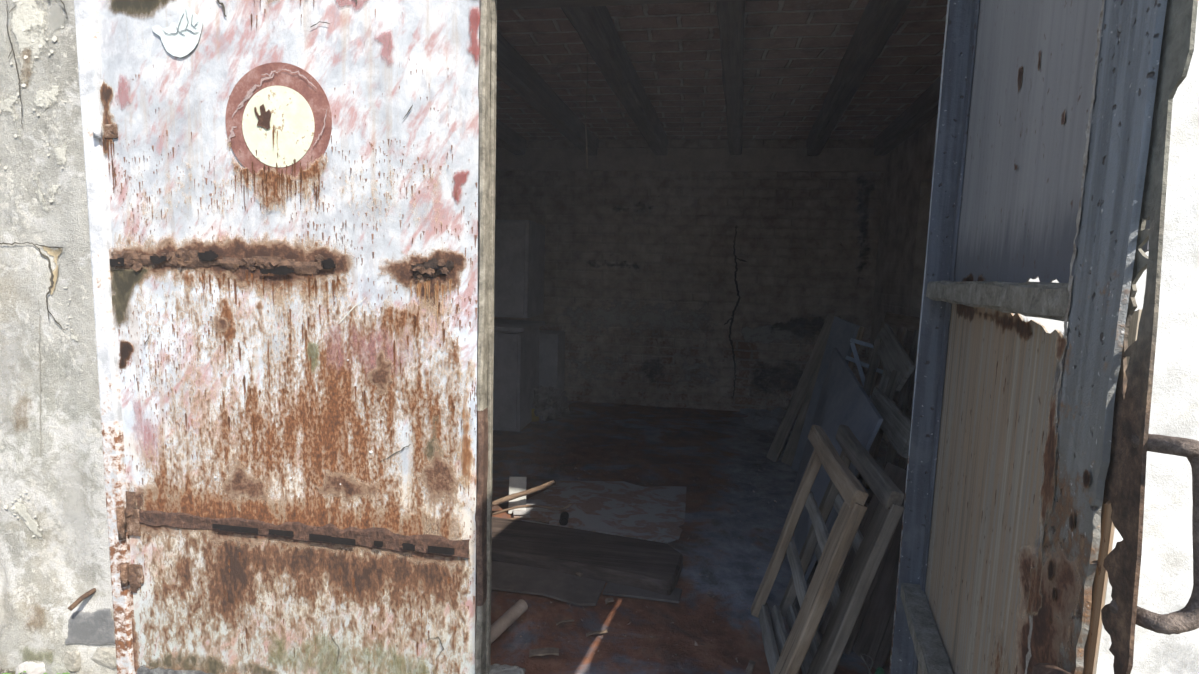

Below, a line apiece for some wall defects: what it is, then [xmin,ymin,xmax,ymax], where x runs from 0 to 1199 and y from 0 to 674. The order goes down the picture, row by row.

crack [6,1,23,128]
flaking render [0,0,66,140]
crack [0,242,65,456]
rust [109,104,474,674]
crack [724,225,747,399]
rust [956,304,1032,339]
flaking render [3,490,42,538]
rust [993,391,1082,674]